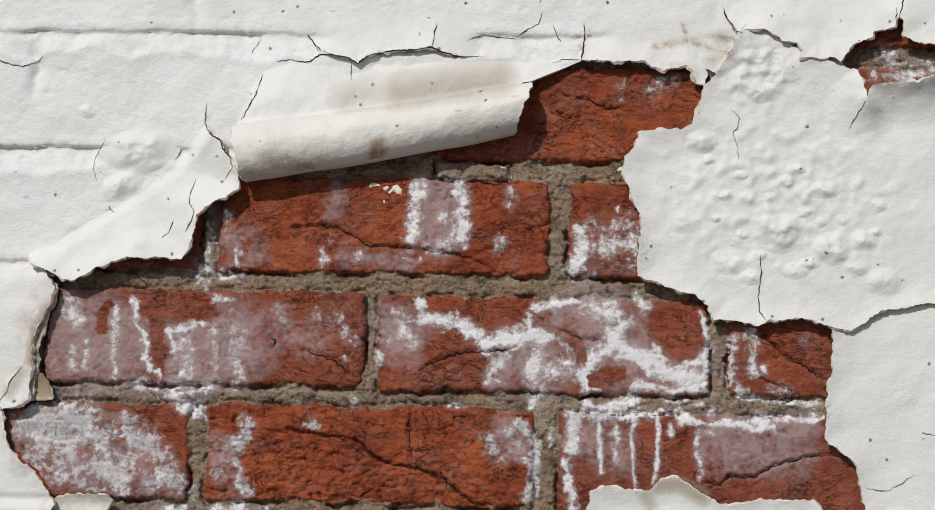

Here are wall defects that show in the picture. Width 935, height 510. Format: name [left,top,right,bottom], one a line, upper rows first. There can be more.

peeling [309,6,491,64]
crack [280,0,585,73]
crack [241,76,262,119]
crack [205,106,240,179]
crack [432,159,510,185]
peeling [0,59,580,510]
efflorescence [633,292,651,312]
peeling [577,0,935,510]
efflorescence [387,296,829,510]
efflorescence [3,394,197,510]
efflorescence [211,417,255,510]